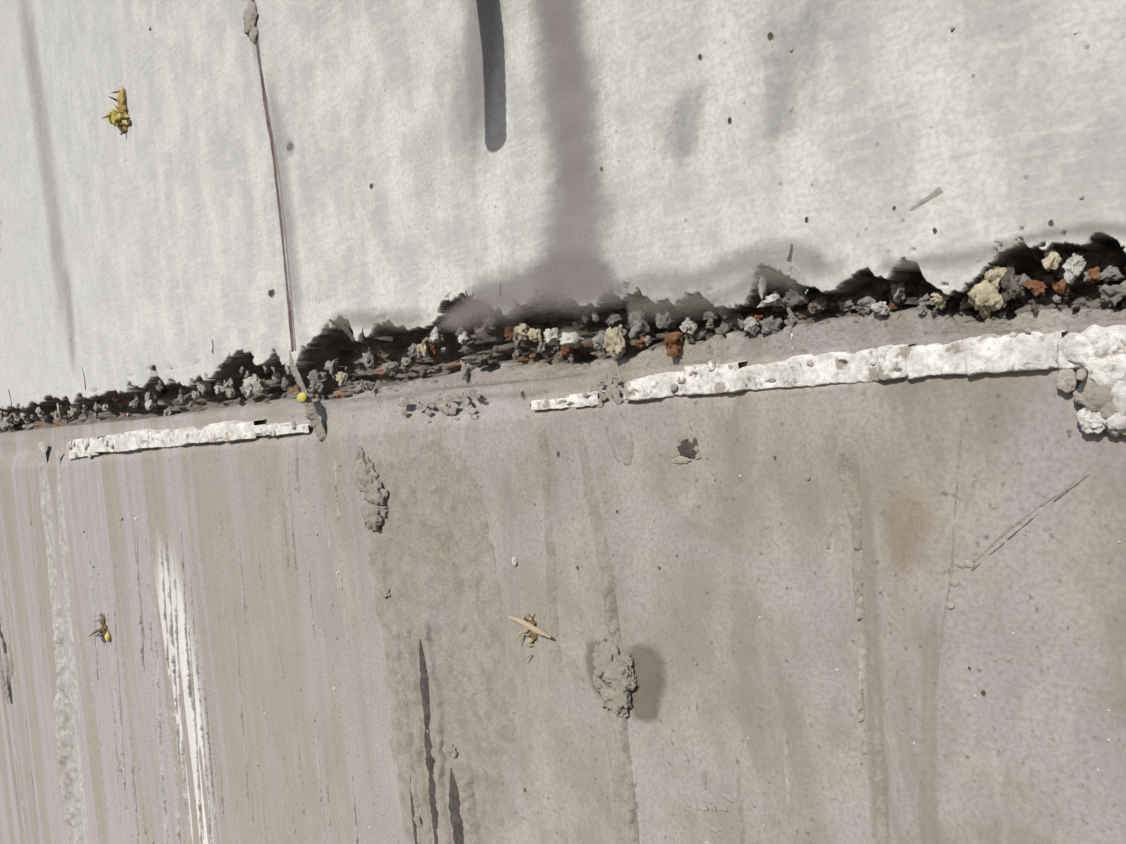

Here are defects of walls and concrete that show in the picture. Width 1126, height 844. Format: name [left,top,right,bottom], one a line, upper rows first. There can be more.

damp [444,0,620,327]
damp [38,442,88,844]
crack [935,415,1093,684]